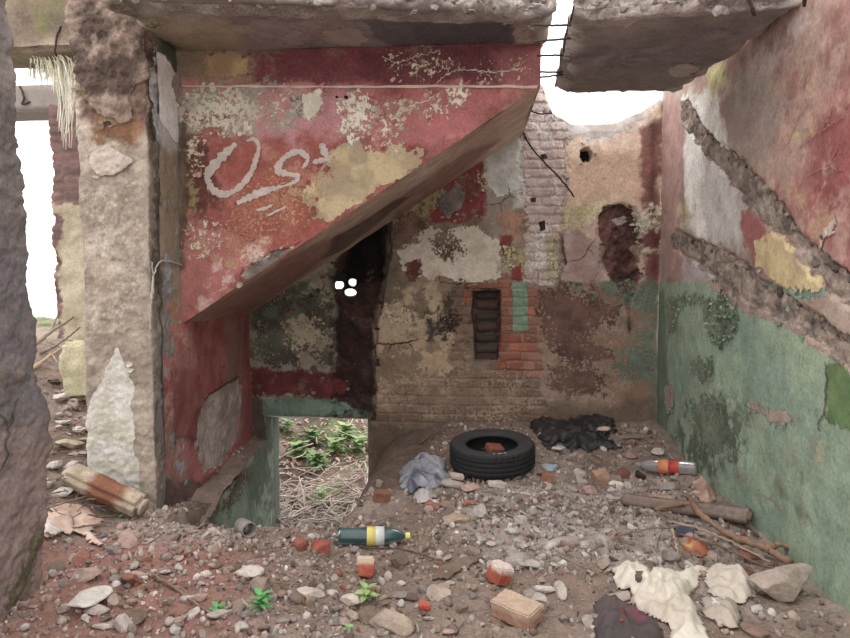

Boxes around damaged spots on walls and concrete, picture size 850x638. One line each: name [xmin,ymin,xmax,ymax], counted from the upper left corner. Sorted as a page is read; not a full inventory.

peeling [120,0,768,288]
flaking render [396,88,850,420]
crack [377,338,423,351]
flaking render [83,348,140,491]
flaking render [194,379,241,474]